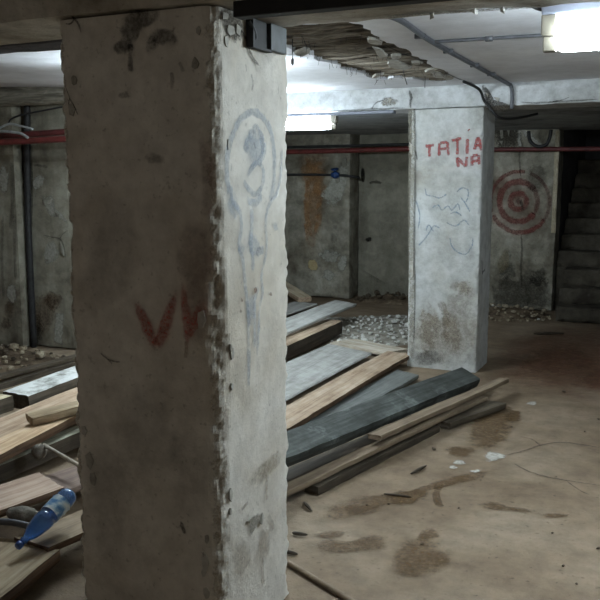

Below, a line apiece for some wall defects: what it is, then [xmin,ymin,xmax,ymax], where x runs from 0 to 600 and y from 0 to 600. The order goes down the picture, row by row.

spalling [283,22,453,84]
spalling [196,9,246,600]
leakage [446,407,520,456]
leakage [329,472,483,517]
leakage [395,530,448,575]